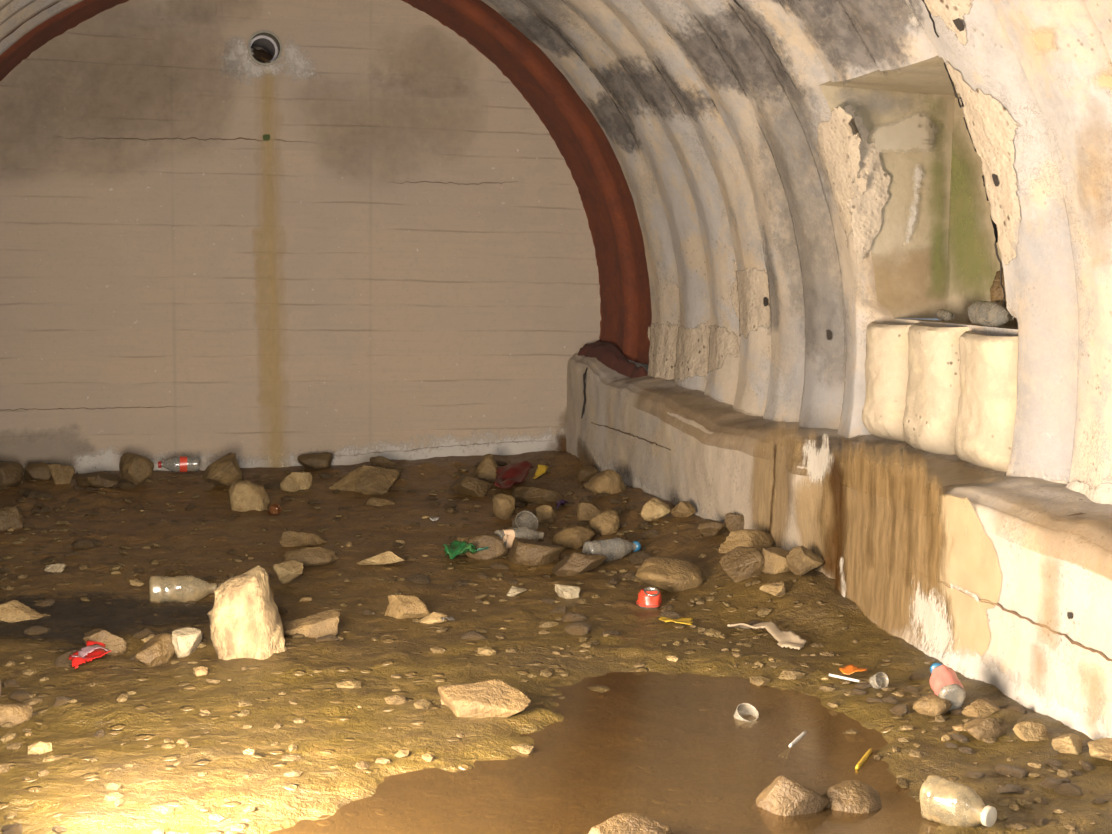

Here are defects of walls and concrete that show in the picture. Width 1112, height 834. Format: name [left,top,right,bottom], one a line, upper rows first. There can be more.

spalling [924,0,973,45]
leakage [223,38,314,79]
crack [63,136,313,144]
spalling [817,104,939,263]
spalling [946,61,1021,265]
leakage [555,437,679,506]
spalling [1045,479,1112,505]
leakage [753,432,1111,740]
crack [941,581,1112,661]